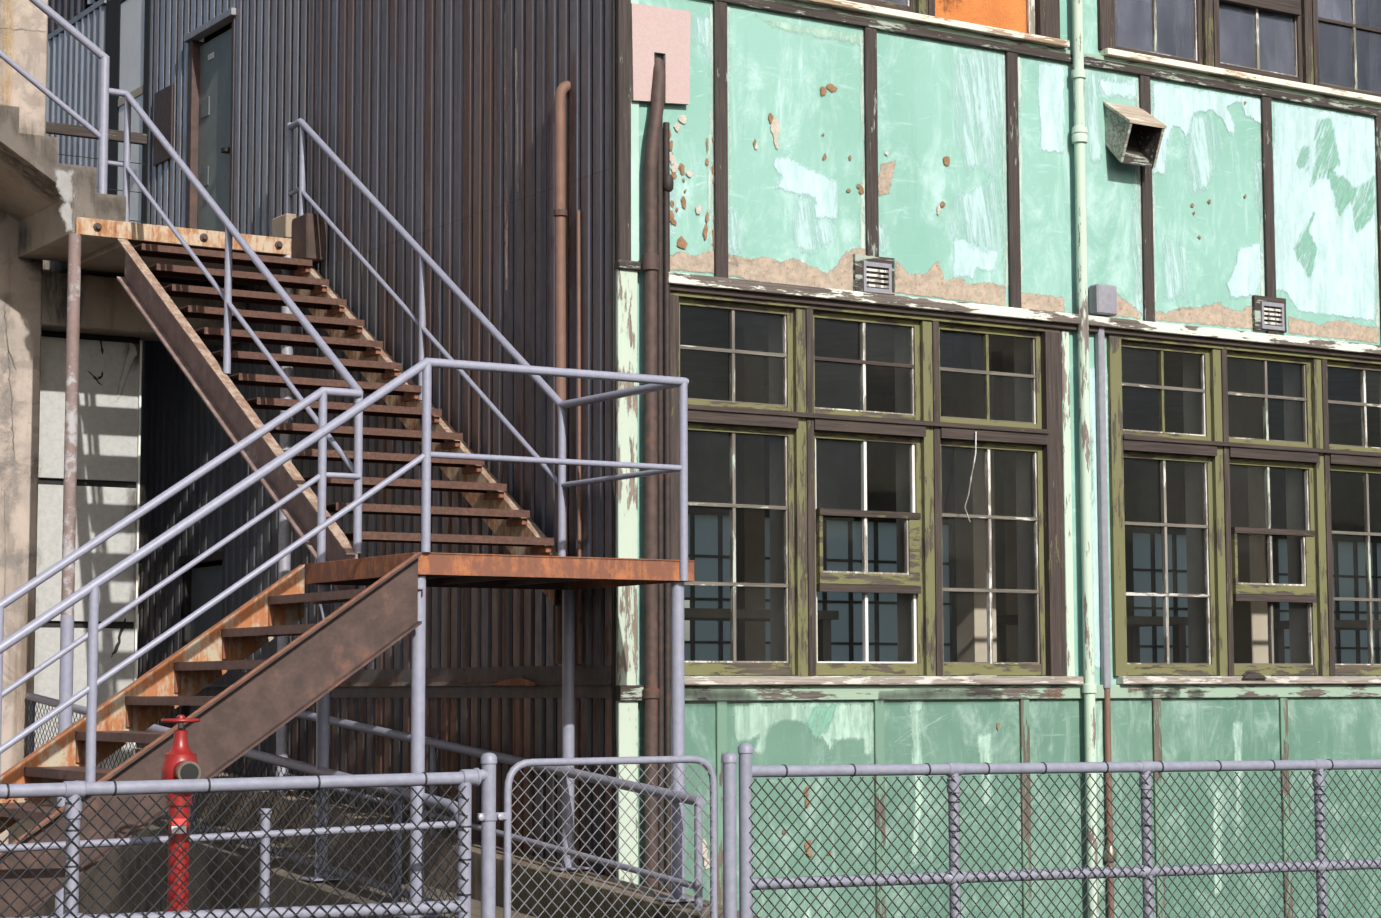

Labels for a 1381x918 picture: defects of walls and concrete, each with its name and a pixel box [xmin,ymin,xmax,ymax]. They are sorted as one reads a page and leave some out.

peeling [821,84,837,96]
flaking render [670,113,866,291]
flaking render [895,261,1065,312]
flaking render [1116,294,1253,330]